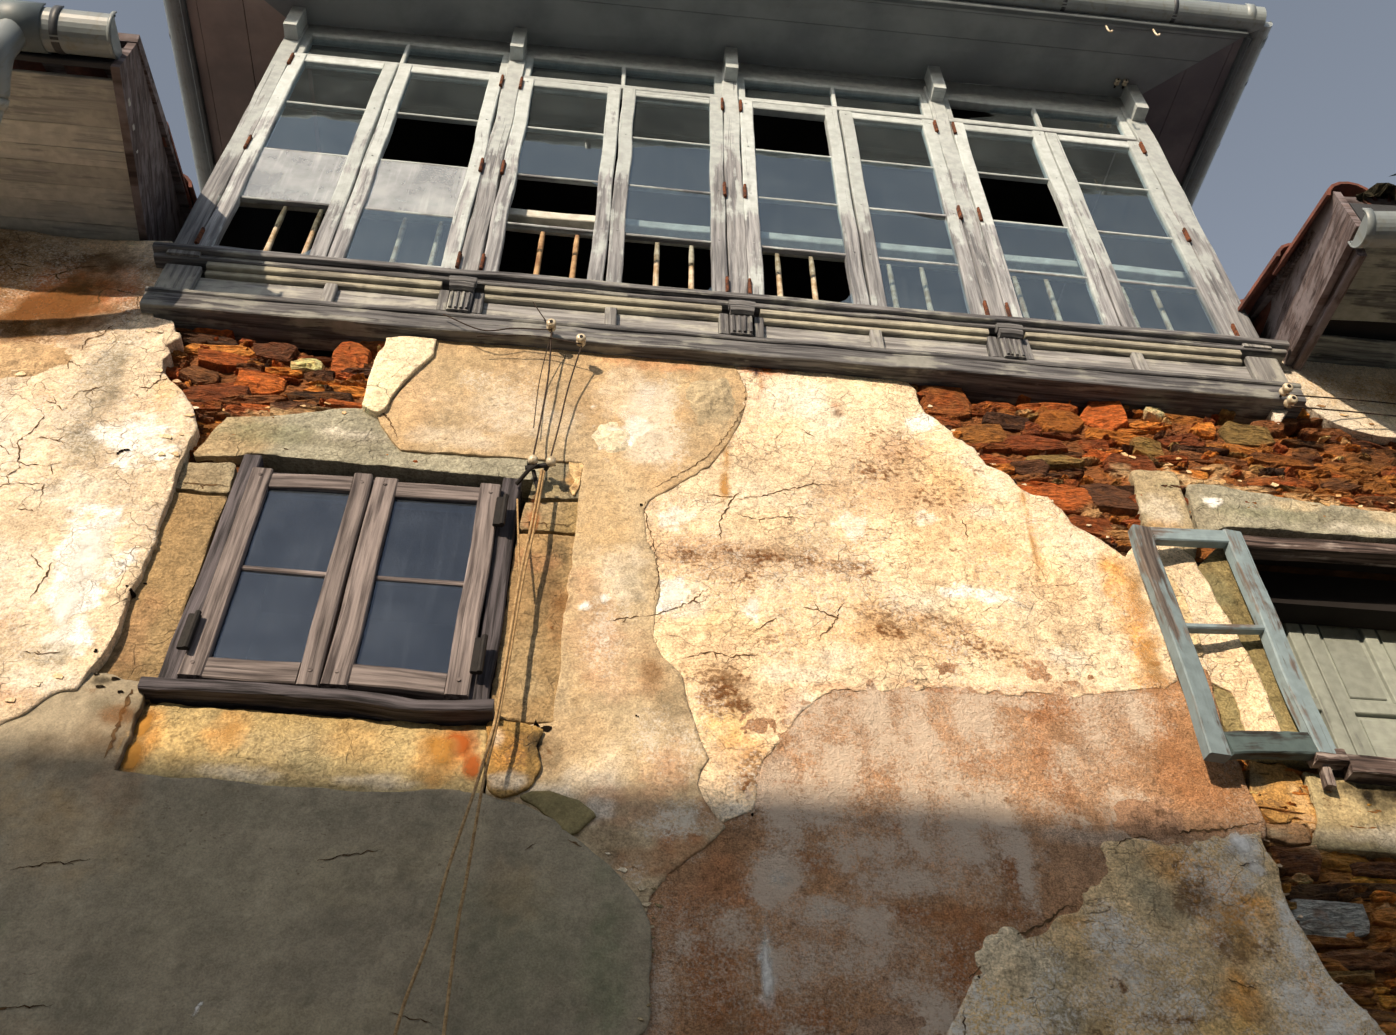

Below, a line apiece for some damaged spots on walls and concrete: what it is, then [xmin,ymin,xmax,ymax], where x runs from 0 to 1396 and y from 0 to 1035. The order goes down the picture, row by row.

leakage [0,279,112,335]
crack [0,263,139,512]
spalling [145,328,437,463]
crack [30,554,52,598]
crack [614,383,746,622]
crack [716,482,837,539]
spalling [909,383,1396,557]
spalling [1195,548,1215,566]
crack [104,689,133,758]
spalling [1237,760,1396,1035]